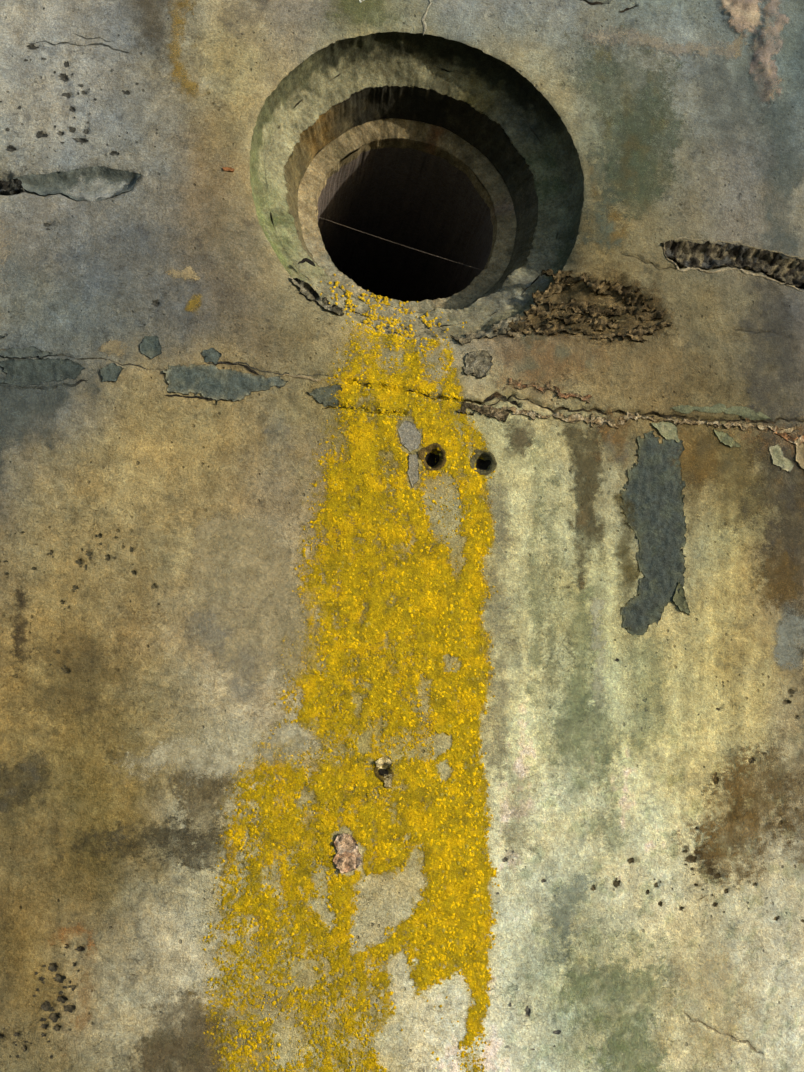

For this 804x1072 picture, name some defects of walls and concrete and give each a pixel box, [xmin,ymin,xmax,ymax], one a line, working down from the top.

flaking render [0,166,142,202]
spalling [661,240,804,289]
spalling [291,276,344,316]
spalling [450,262,679,379]
flaking render [0,335,86,387]
crack [4,354,227,401]
flaking render [163,347,288,403]
crack [193,361,332,382]
crack [457,378,804,446]
flaking render [769,438,804,473]
leakage [11,590,28,658]
leakage [0,750,46,813]